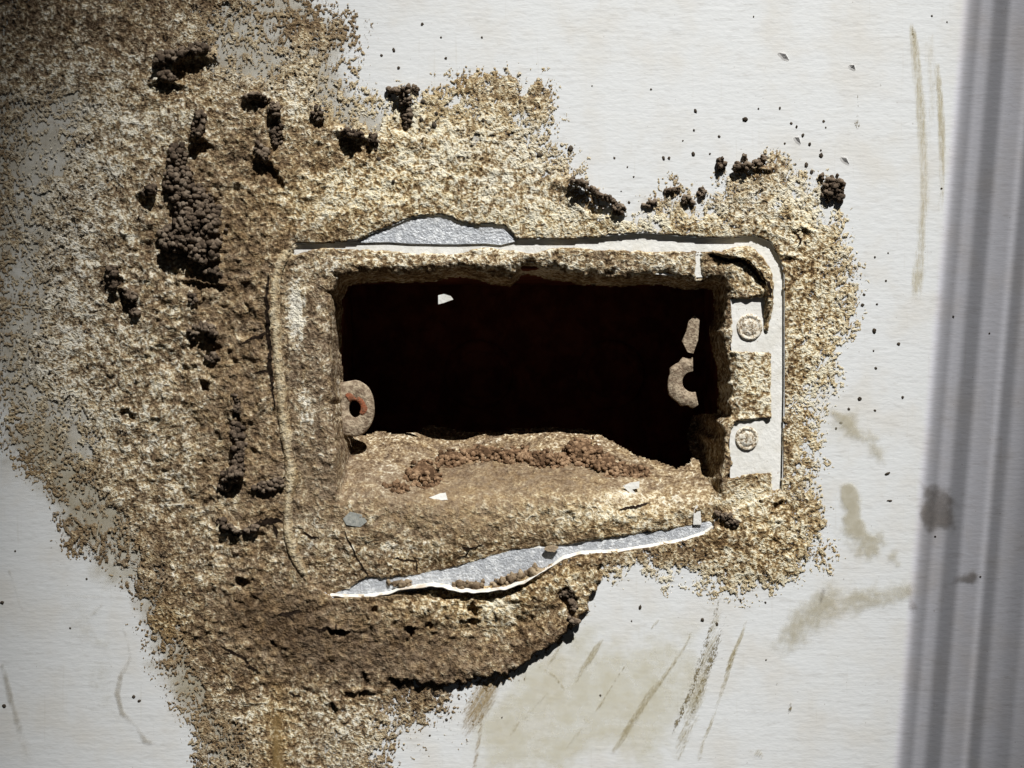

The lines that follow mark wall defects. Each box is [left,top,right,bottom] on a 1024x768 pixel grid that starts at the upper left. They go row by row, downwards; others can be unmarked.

peeling [438,294,453,304]
peeling [330,505,713,598]